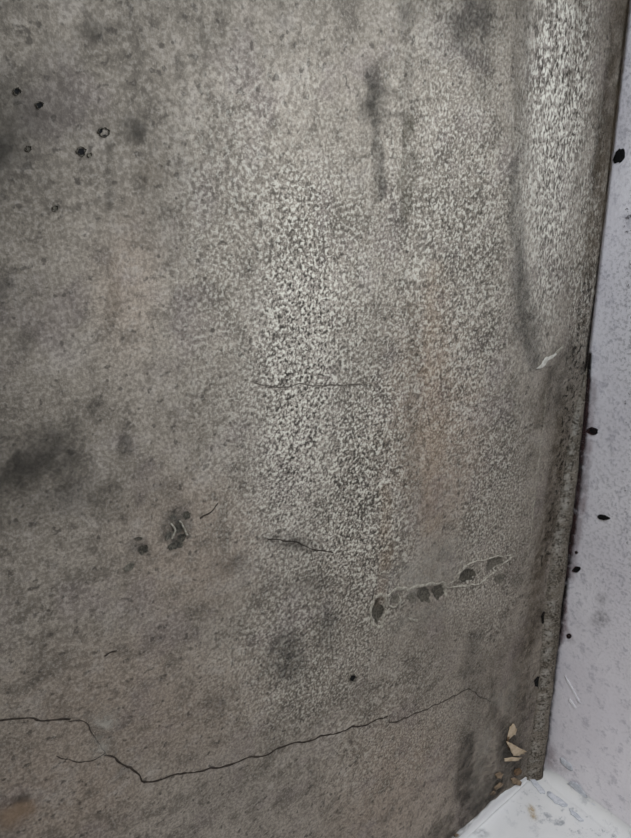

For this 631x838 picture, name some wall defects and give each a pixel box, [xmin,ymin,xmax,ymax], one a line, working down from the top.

crack [0,688,494,783]